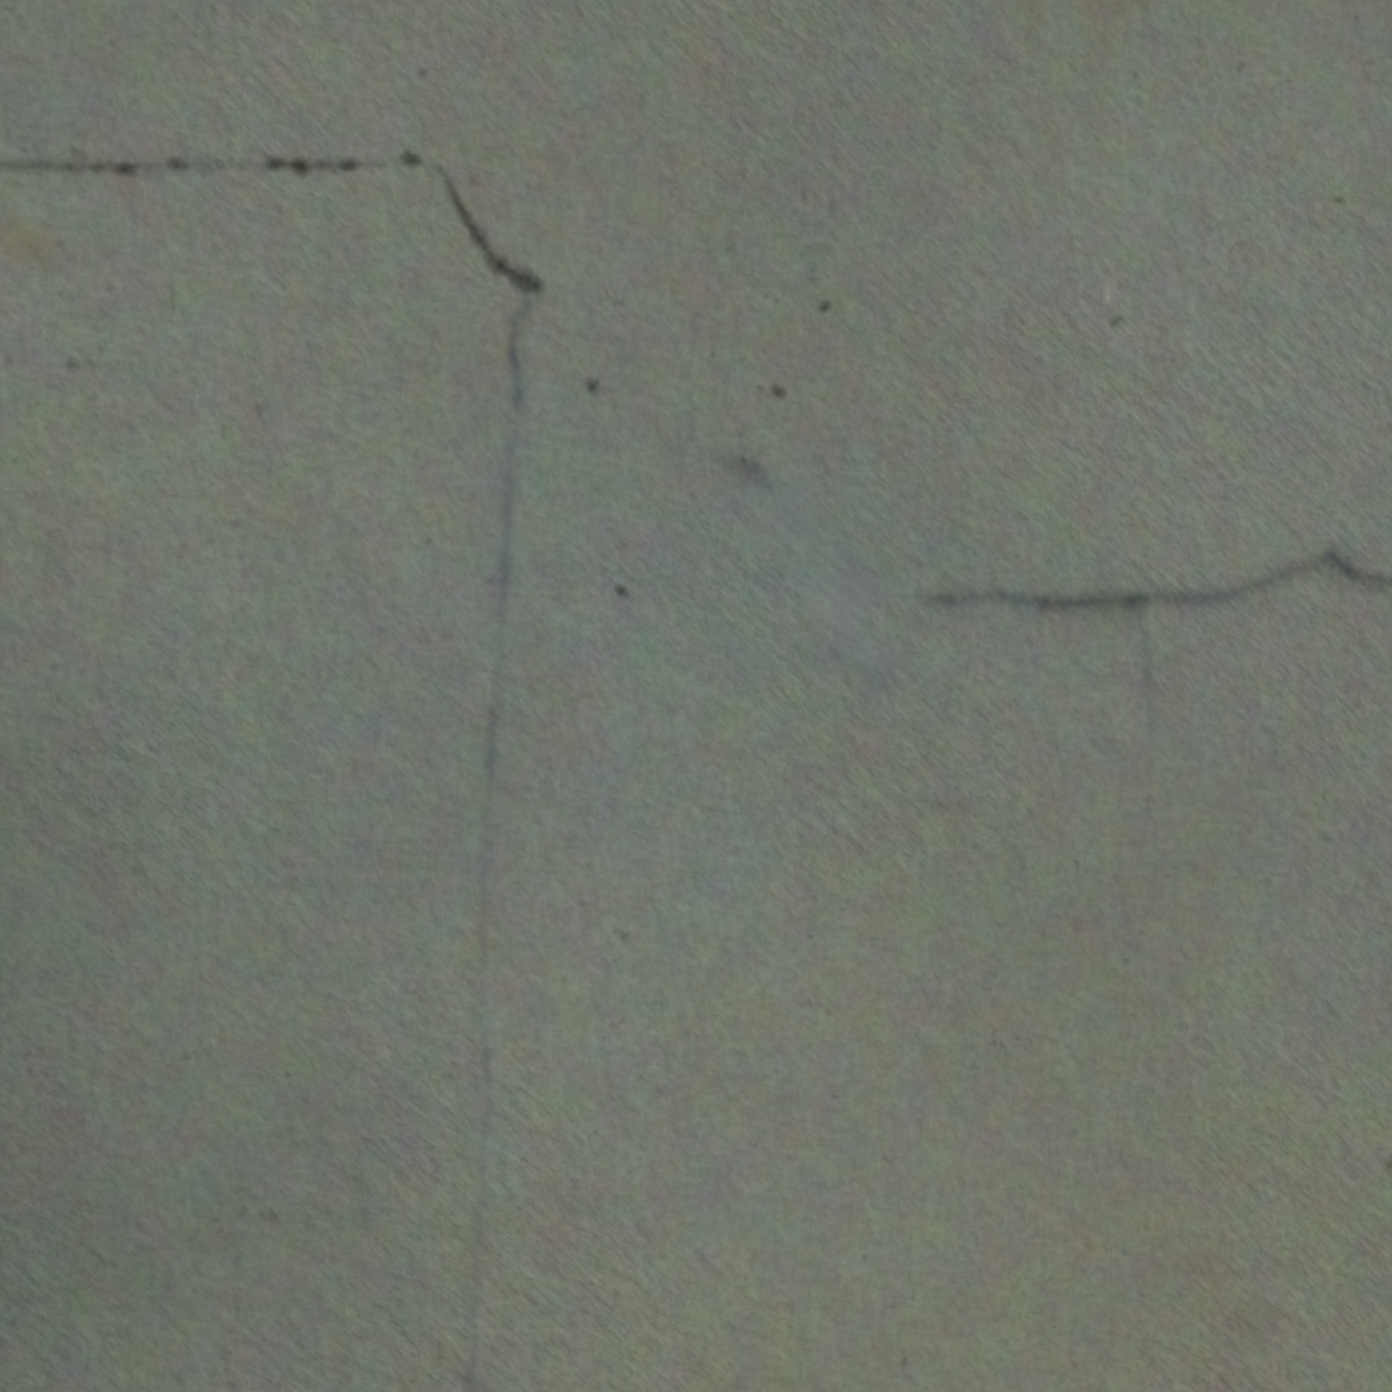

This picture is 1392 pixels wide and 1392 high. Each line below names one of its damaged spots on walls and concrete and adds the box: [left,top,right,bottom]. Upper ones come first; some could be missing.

crack [457,200,539,288]